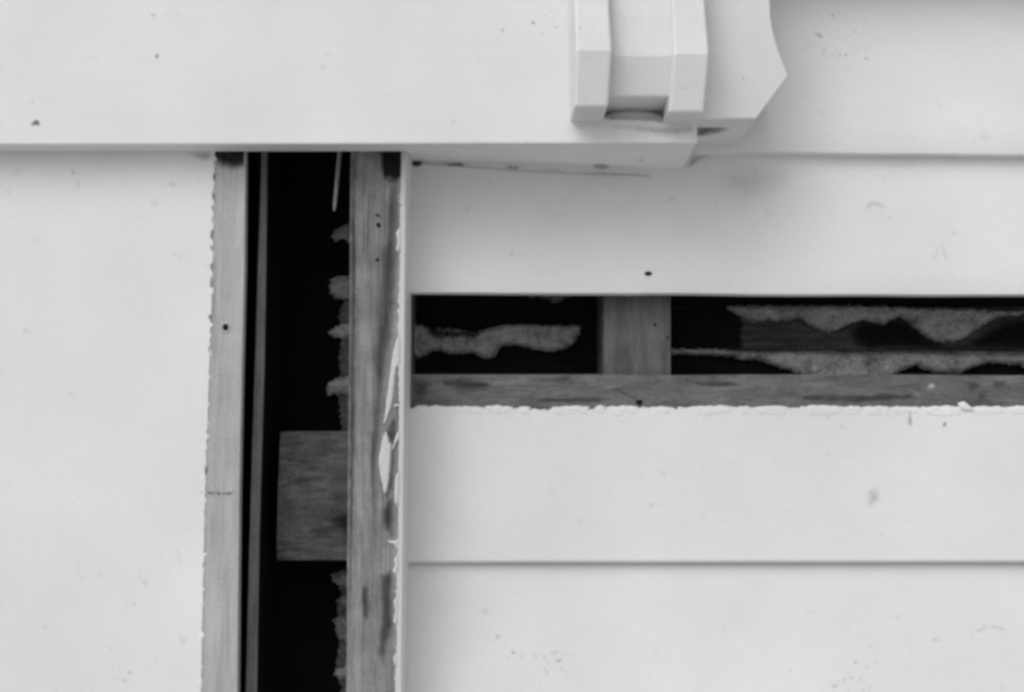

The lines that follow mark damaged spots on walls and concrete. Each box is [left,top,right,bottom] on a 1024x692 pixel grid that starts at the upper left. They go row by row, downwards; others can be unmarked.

peeling [415,405,530,415]
peeling [552,405,671,416]
peeling [693,405,1024,417]
peeling [379,336,400,506]
peeling [388,540,400,575]